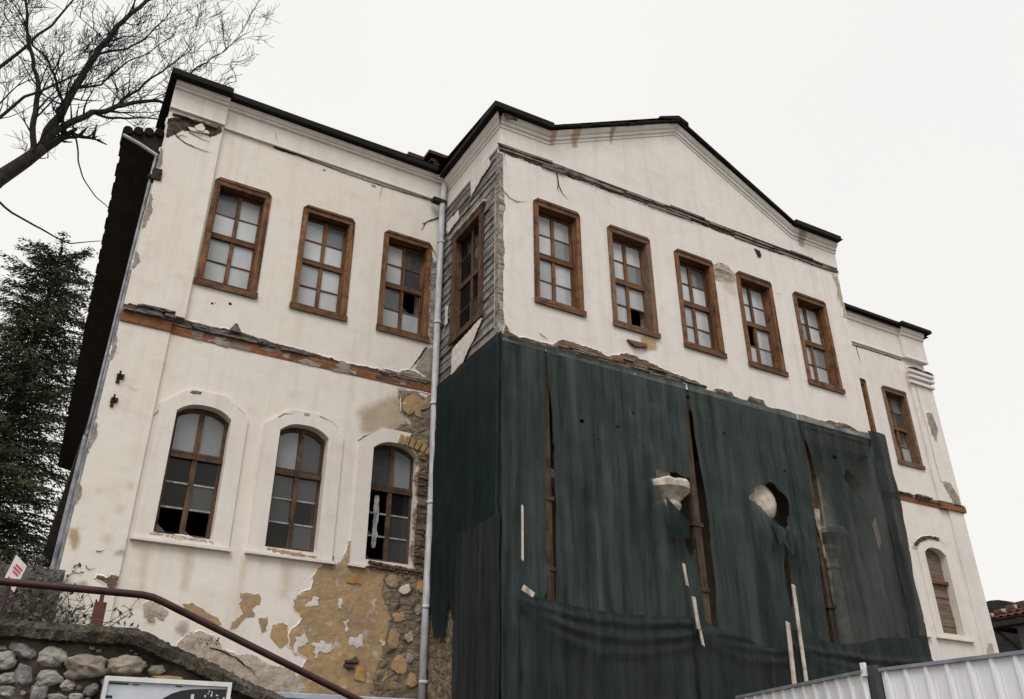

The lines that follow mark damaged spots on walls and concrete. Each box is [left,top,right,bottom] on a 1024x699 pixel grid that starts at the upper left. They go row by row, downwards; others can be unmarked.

flaking render [156,113,224,168]
flaking render [497,142,847,318]
flaking render [497,177,734,396]
leakage [363,396,406,433]
flaking render [925,412,938,443]
peeling [172,251,453,699]
flaking render [142,600,168,621]